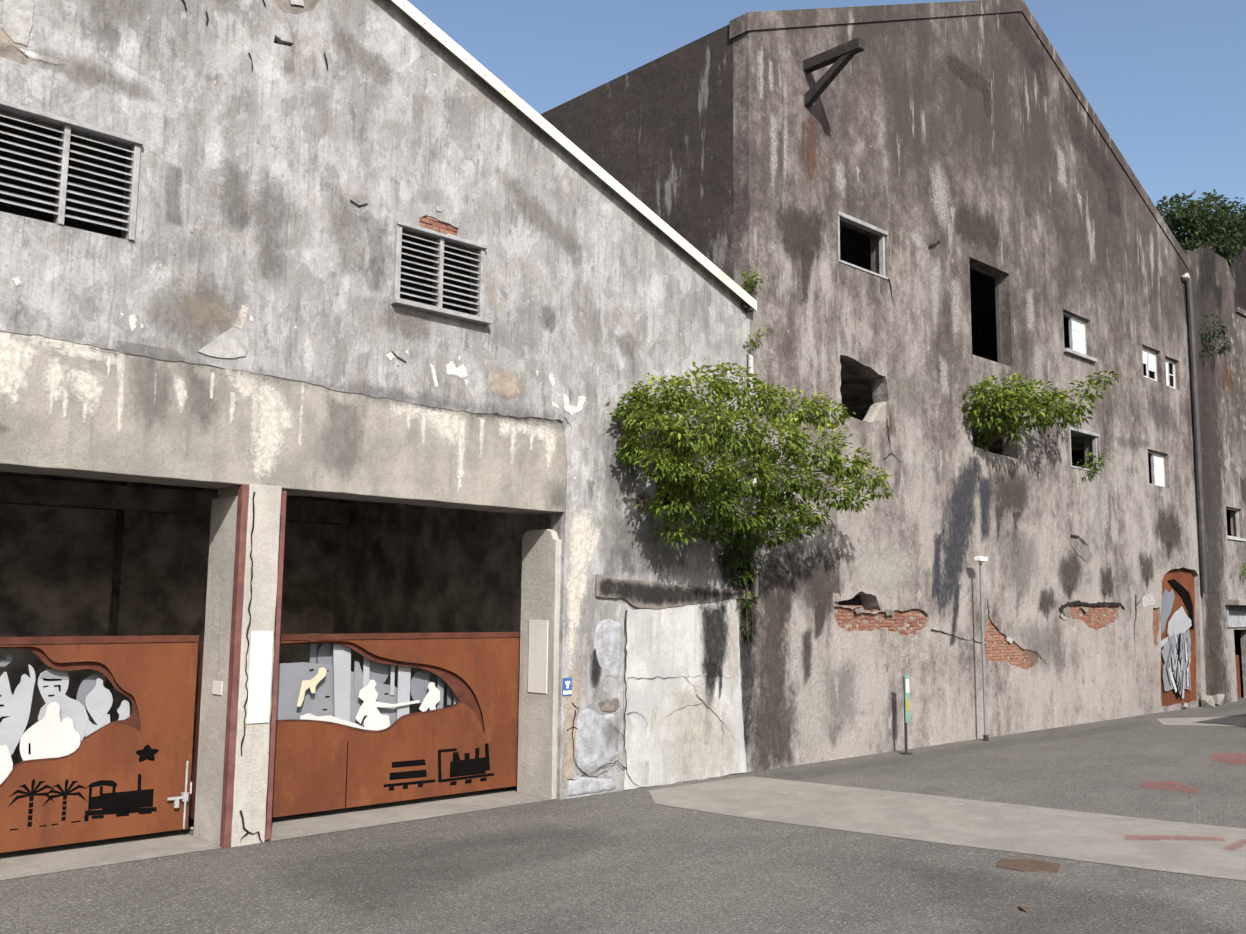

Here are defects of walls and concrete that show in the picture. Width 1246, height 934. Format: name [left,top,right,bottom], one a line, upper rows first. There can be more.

peeling [0,0,65,65]
peeling [263,0,318,14]
spalling [419,206,458,236]
peeling [197,305,254,358]
water stain [0,331,124,432]
water stain [172,373,187,409]
water stain [210,369,305,478]
water stain [910,451,1028,644]
water stain [562,509,915,793]
spalling [834,595,927,637]
spalling [984,618,1039,670]
spalling [1062,605,1118,630]